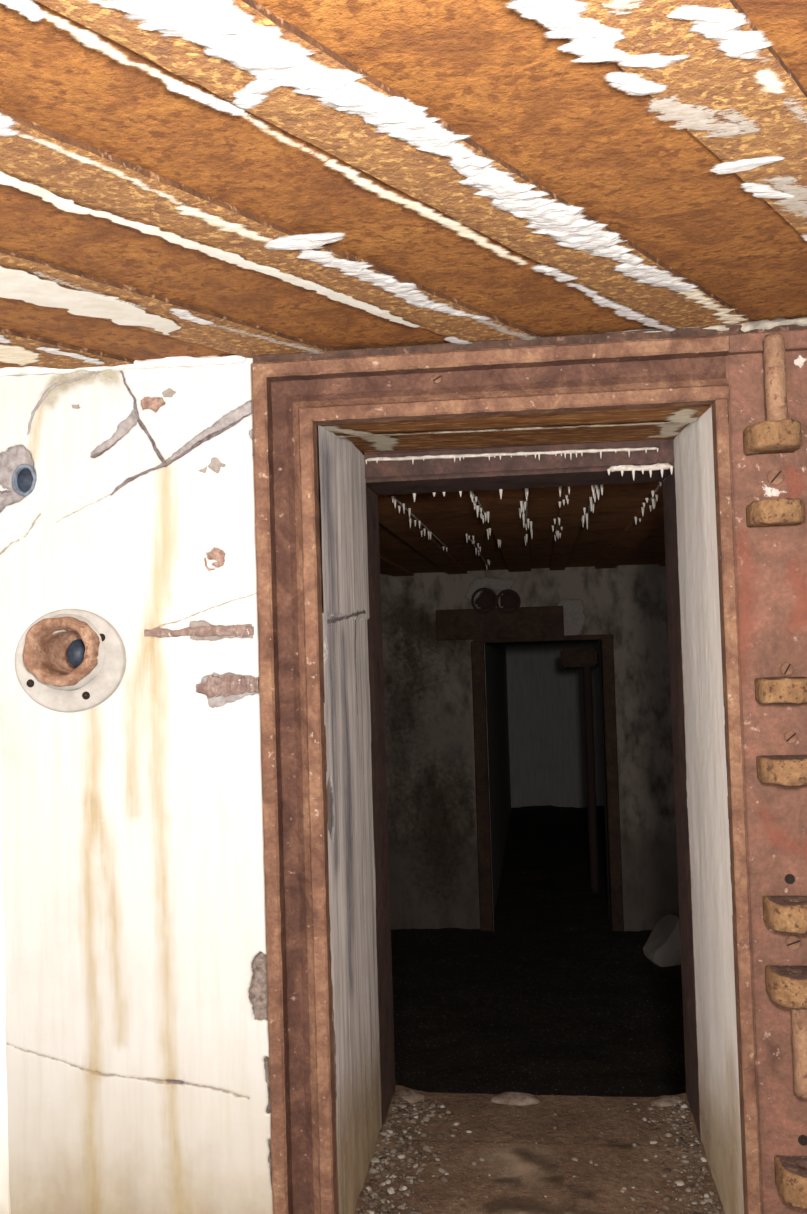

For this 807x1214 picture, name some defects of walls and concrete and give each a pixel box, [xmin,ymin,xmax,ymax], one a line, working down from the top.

rust [141,397,165,413]
spalling [0,445,34,512]
crack [0,371,252,554]
rust [204,548,225,571]
spalling [189,620,253,641]
spalling [201,672,259,708]
spalling [249,952,268,1020]
crack [29,1051,249,1098]